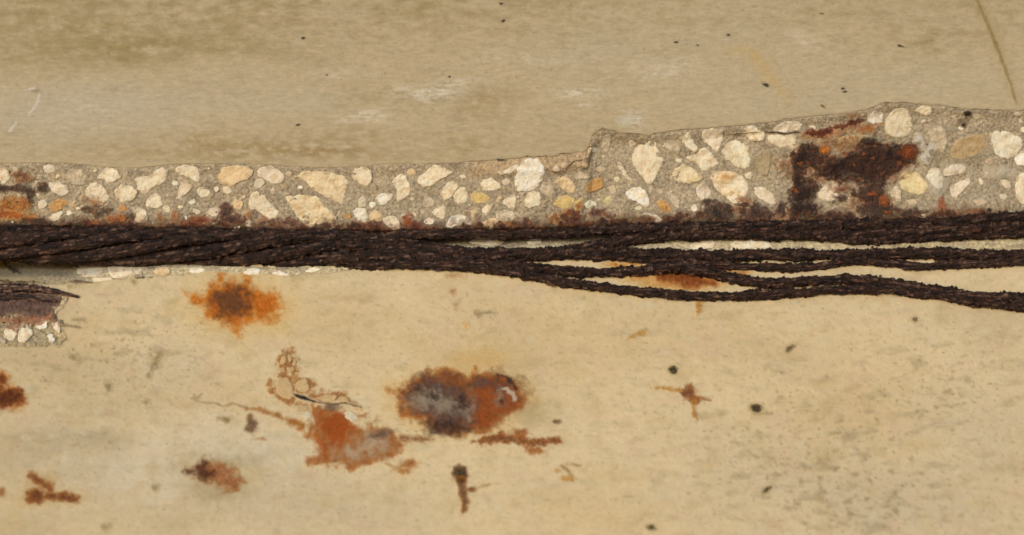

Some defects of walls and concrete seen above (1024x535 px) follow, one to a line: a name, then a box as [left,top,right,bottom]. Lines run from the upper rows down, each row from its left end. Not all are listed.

rust [0,111,1024,240]
spalling [0,102,1024,251]
spalling [0,262,349,348]
rust [598,260,755,317]
rust [0,367,30,415]
rust [165,264,564,518]
rust [648,381,713,422]
rust [0,467,95,513]